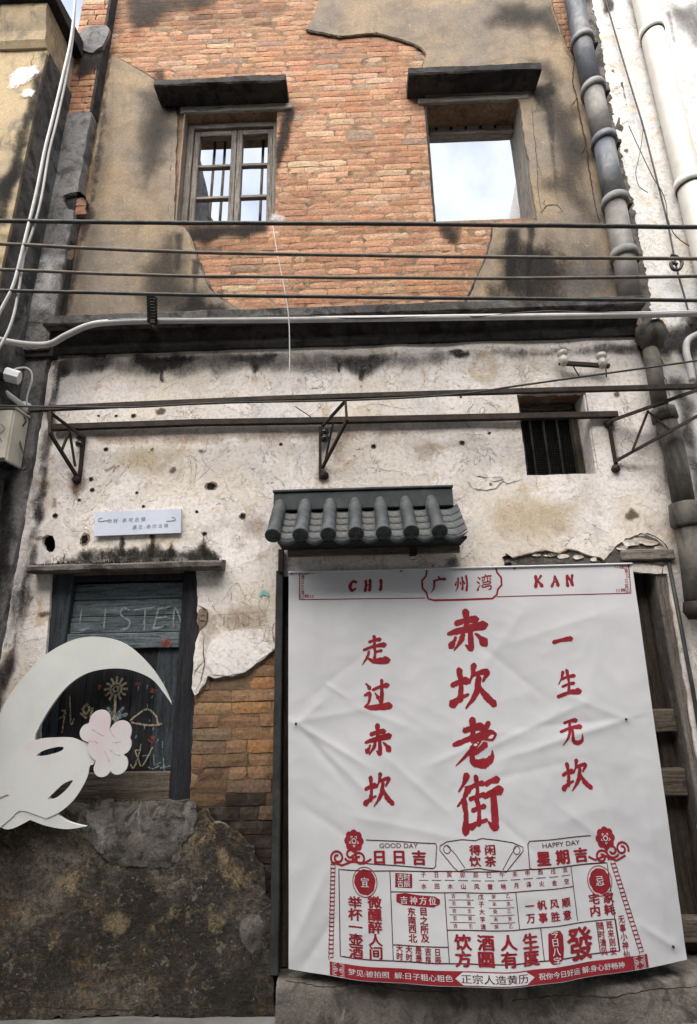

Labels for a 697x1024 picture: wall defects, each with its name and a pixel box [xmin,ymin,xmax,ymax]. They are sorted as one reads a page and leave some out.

leakage [76,53,101,76]
leakage [142,93,174,172]
flaking render [68,0,523,309]
spalling [63,192,89,218]
leakage [63,89,106,316]
leakage [440,227,459,241]
leakage [488,228,612,297]
leakage [0,349,469,625]
spalling [603,533,671,564]
leakage [0,638,15,708]
flaking render [190,629,275,898]